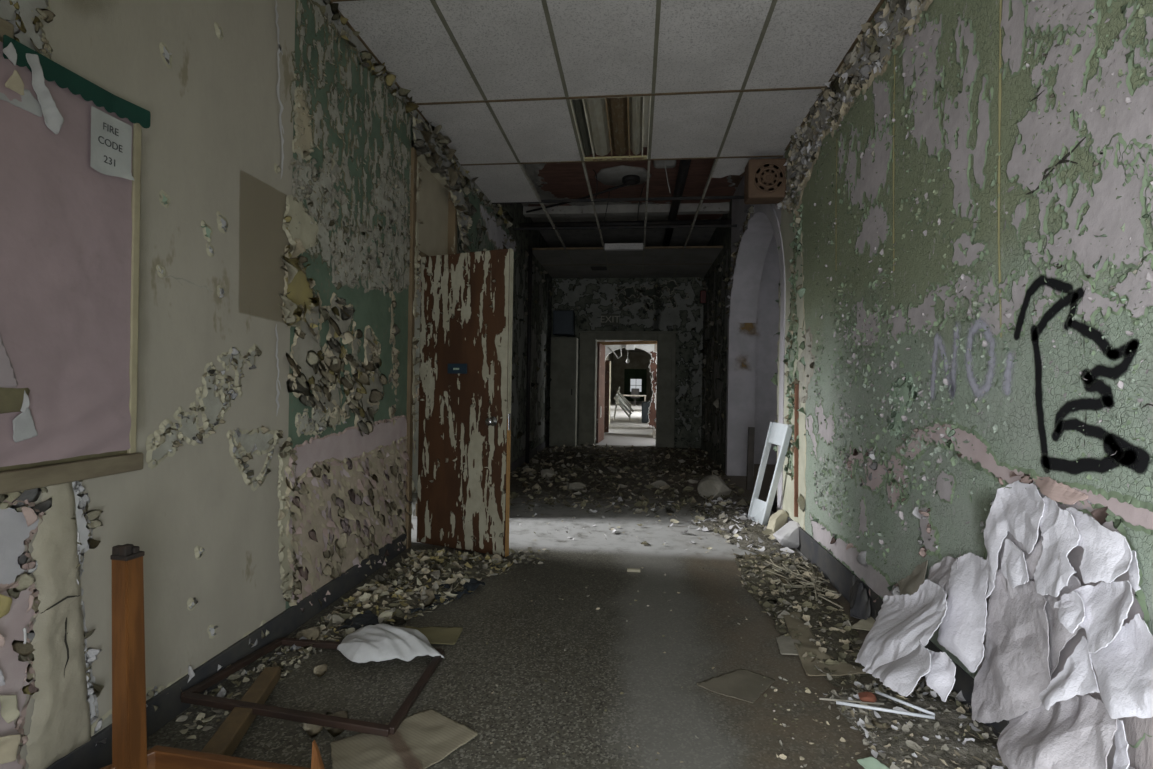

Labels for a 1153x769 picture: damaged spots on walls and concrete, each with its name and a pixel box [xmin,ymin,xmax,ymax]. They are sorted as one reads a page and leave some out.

peeling [0,488,52,769]
peeling [71,480,112,747]
peeling [145,0,517,603]
peeling [734,0,1153,769]